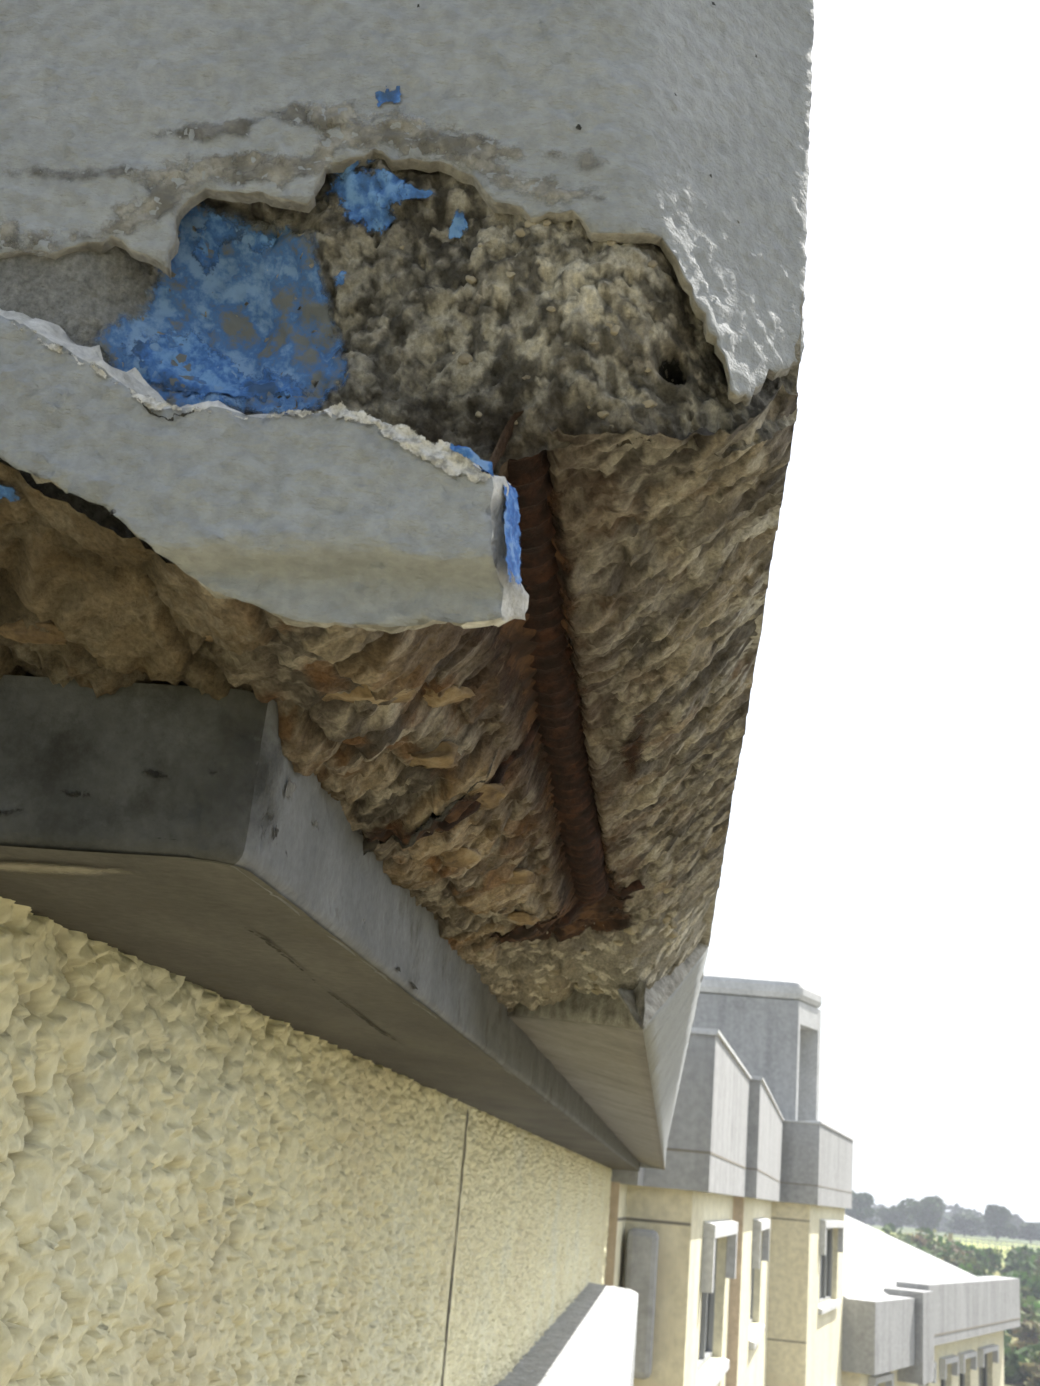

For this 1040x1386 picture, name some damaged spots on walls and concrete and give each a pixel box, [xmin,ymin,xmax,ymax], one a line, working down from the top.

spalling [0,134,798,586]
peeling [321,684,476,708]
rust [365,450,645,945]
peeling [408,741,461,769]
peeling [468,783,506,809]
peeling [507,911,541,926]
crack [442,1111,469,1386]